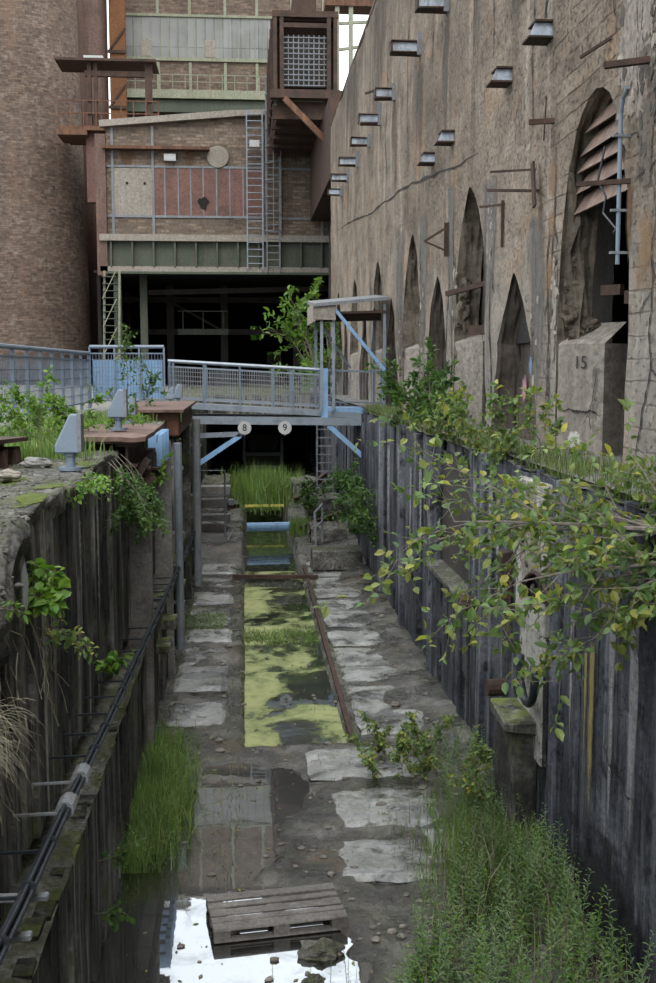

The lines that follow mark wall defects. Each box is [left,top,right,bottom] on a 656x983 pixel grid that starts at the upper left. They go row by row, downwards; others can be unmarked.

crack [336,23,478,231]
spalling [613,0,656,188]
crack [634,159,656,465]